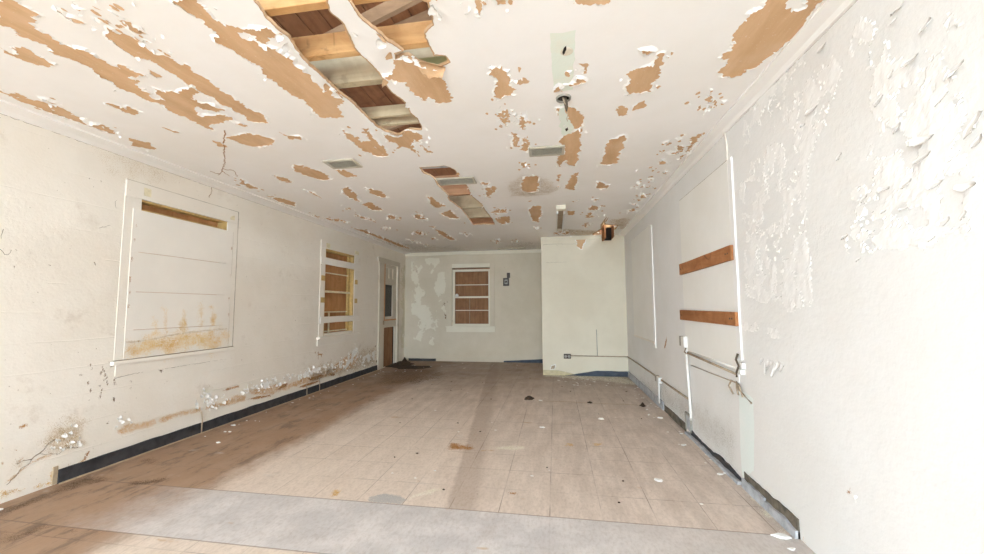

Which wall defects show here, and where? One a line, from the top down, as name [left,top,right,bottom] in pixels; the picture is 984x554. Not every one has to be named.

peeling [0,0,307,151]
peeling [168,0,434,158]
peeling [376,38,454,108]
peeling [616,45,675,116]
peeling [716,0,825,79]
peeling [485,62,616,250]
peeling [596,134,629,167]
peeling [841,16,983,262]
peeling [270,164,473,349]
damp [121,301,233,359]
flaking render [114,347,376,435]
crack [7,440,78,485]